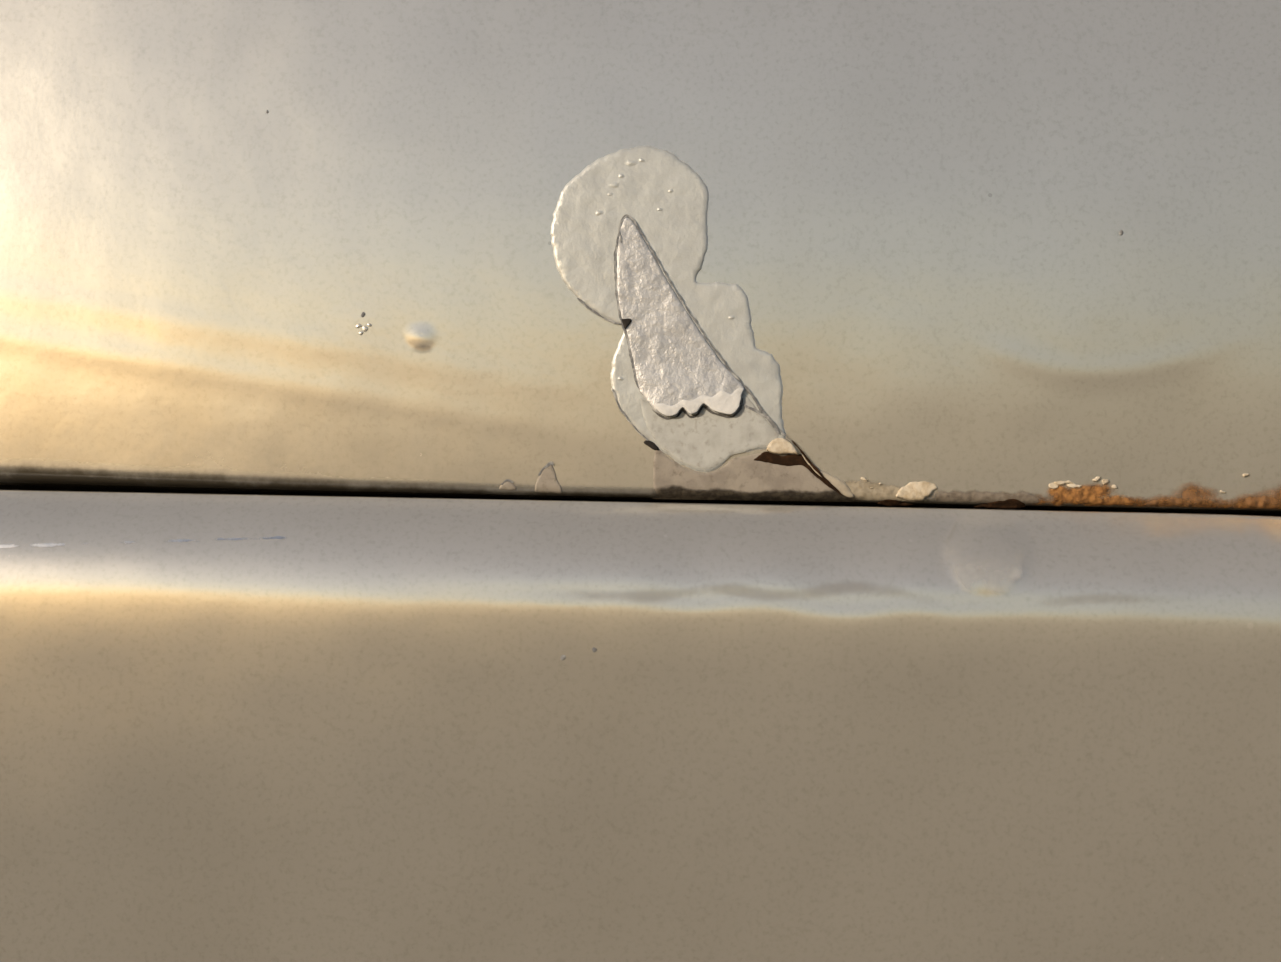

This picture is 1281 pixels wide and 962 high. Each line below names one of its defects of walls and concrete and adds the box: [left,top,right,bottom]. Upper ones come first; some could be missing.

peeling [550,146,1039,509]
peeling [535,461,562,493]
rust [1034,476,1281,509]